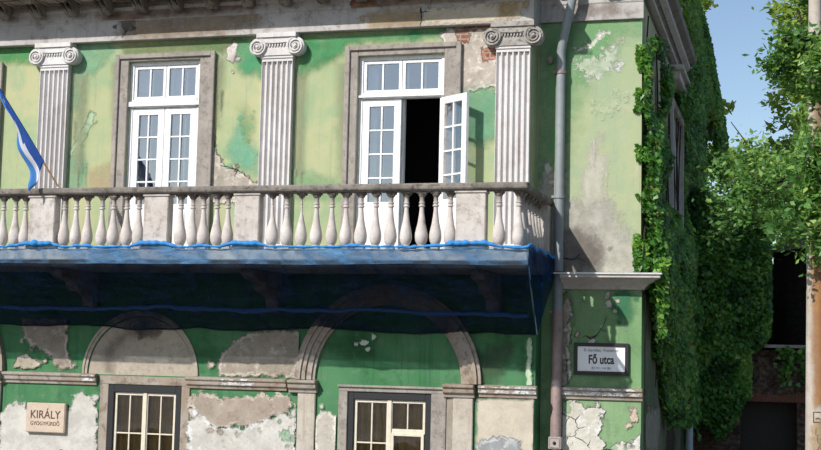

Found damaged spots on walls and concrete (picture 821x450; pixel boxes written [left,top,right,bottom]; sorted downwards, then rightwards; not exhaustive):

flaking render [439,25,496,93]
peeling [570,30,625,82]
damp [580,140,608,215]
flaking render [13,318,76,369]
flaking render [0,392,99,450]
flaking render [186,330,299,450]
flaking render [476,386,536,450]
crack [561,412,612,450]
flaking render [562,290,661,450]
corrosion [811,243,821,406]